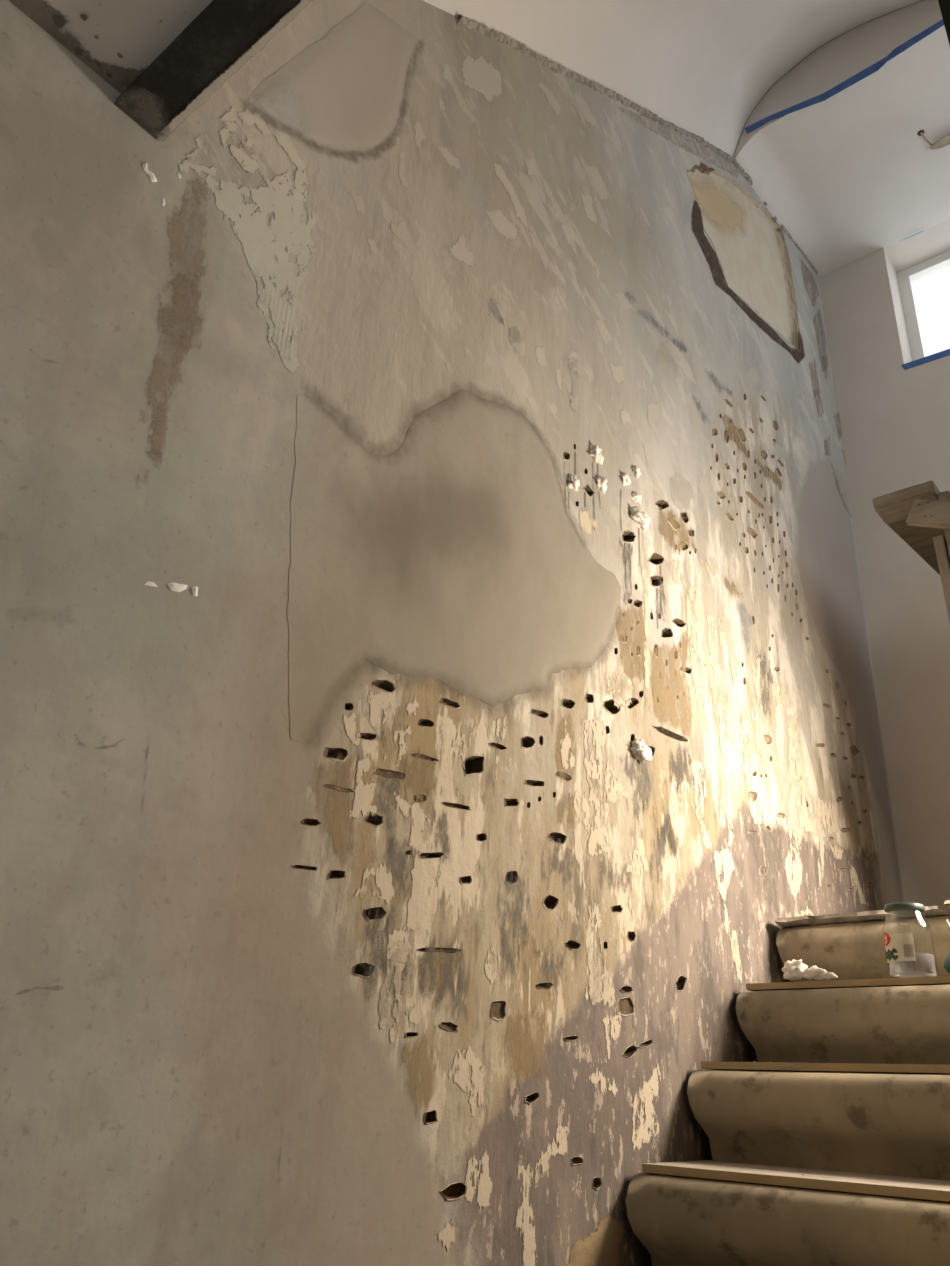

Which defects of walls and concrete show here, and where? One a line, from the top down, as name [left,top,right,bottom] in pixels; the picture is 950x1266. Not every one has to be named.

spalling [457,15,846,464]
damp [287,389,640,743]
peeling [324,679,462,1043]
damp [436,814,450,854]
damp [625,756,651,819]
damp [650,816,678,875]
damp [669,747,695,791]
peeling [524,531,950,983]
damp [759,655,773,715]
peeling [585,897,661,1151]
peeling [440,1151,492,1209]
peeling [516,1122,583,1266]